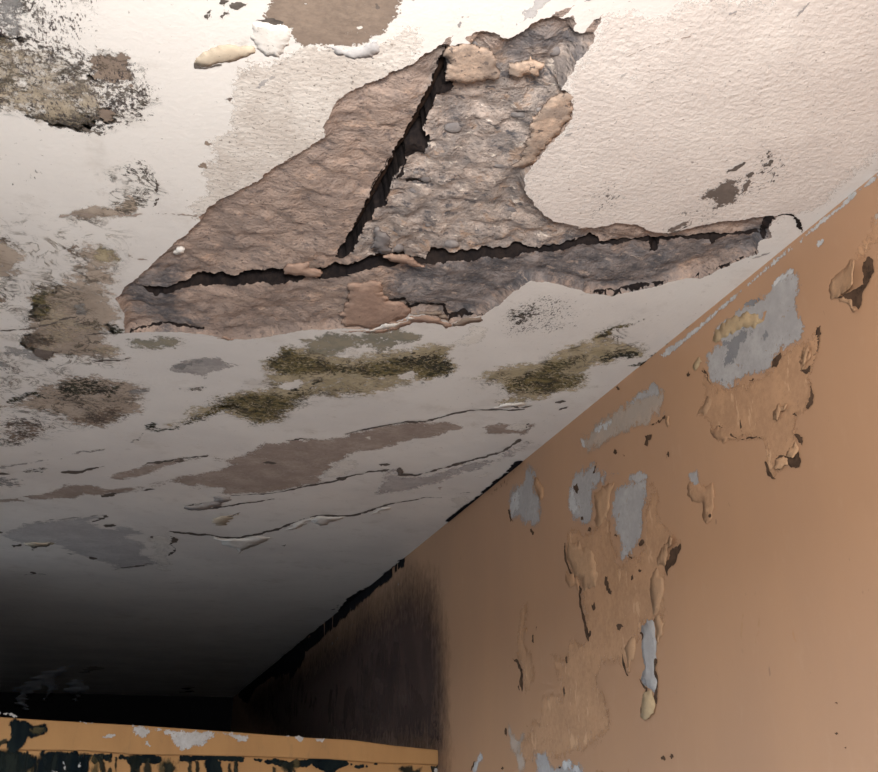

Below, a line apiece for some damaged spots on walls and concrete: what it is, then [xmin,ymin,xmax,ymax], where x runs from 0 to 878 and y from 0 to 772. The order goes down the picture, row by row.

leakage [0,0,158,136]
crack [143,45,803,297]
spalling [115,0,878,341]
crack [1,317,205,365]
leakage [131,324,488,443]
crack [389,297,483,321]
peeling [687,268,821,480]
peeling [0,418,463,503]
crack [169,439,529,554]
peeling [504,382,681,772]
leakage [238,558,445,751]
leakage [0,718,378,772]